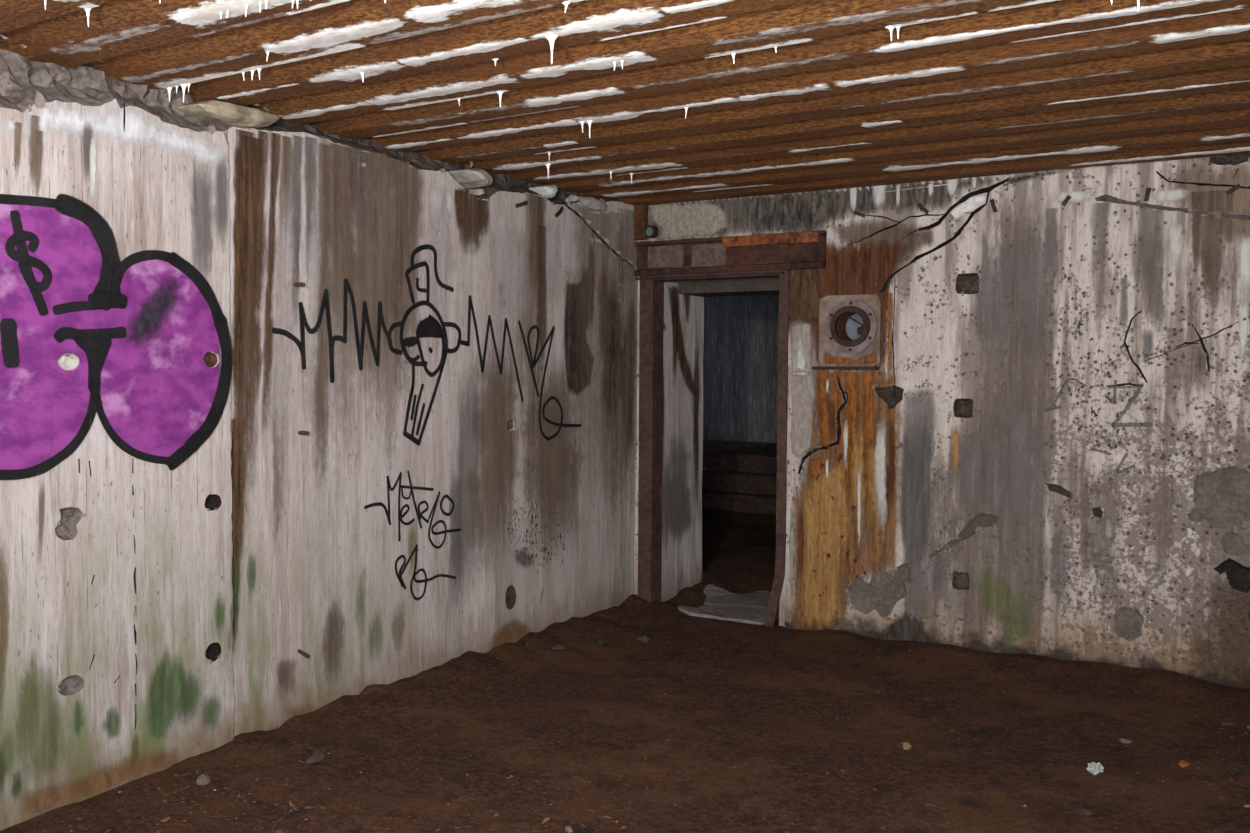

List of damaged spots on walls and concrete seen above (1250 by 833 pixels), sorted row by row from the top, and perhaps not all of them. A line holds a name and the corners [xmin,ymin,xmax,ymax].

crack [1156,168,1250,189]
damp [31,0,1250,642]
crack [846,178,1009,396]
rust [722,231,902,630]
crack [798,375,848,474]
spalling [928,512,999,560]
peeling [844,562,912,618]